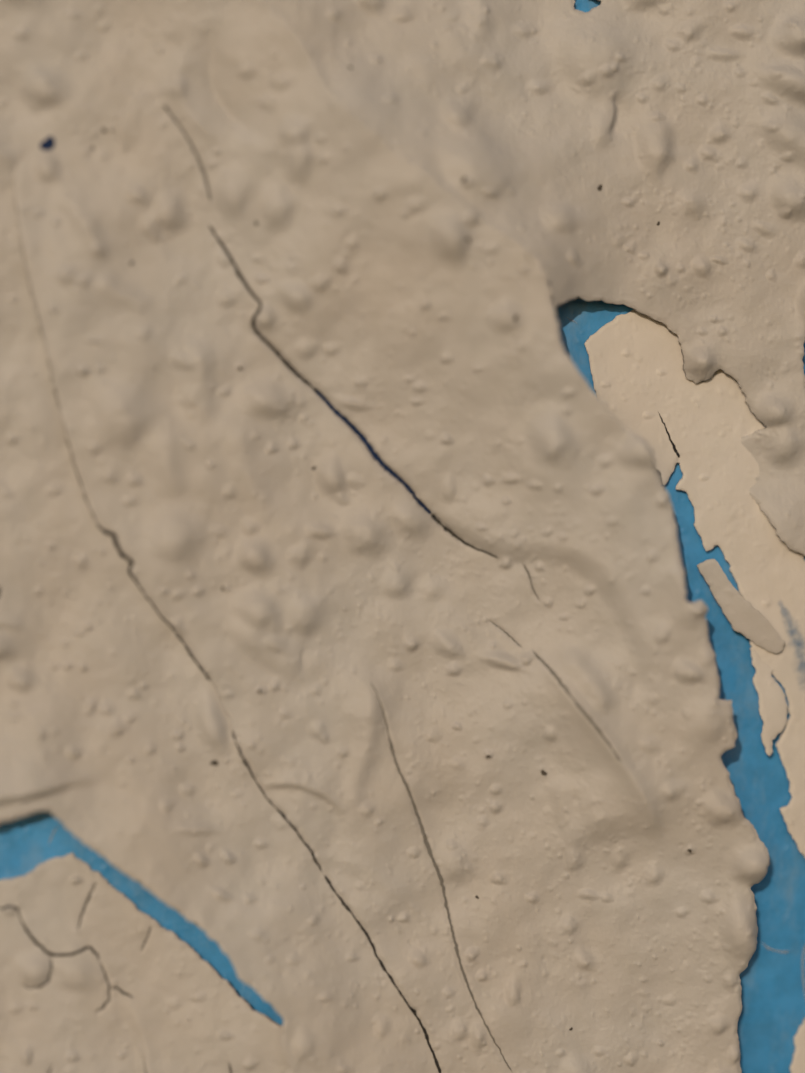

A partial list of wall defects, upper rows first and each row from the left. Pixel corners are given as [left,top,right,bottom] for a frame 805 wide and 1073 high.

crack [165,107,211,199]
peeling [574,0,600,12]
crack [12,179,211,681]
crack [209,226,497,558]
crack [524,565,539,599]
peeling [554,297,805,1073]
crack [0,883,132,1011]
peeling [0,811,289,1073]
crack [232,730,441,1073]
crack [371,684,511,1070]